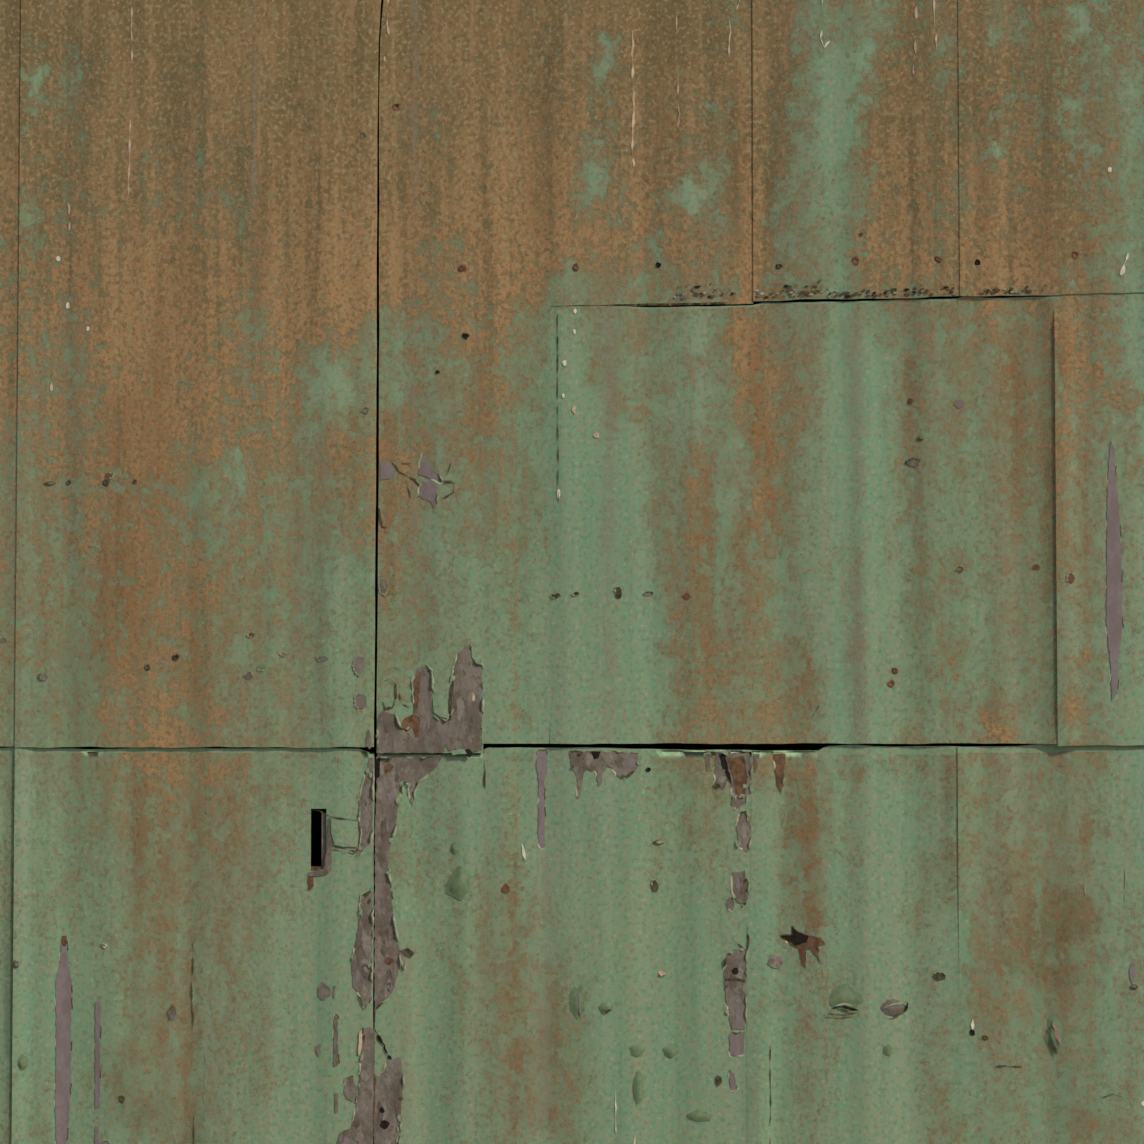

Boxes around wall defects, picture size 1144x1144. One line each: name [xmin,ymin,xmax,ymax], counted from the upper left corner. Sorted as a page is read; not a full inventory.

corrosion [829,0,1144,818]
corrosion [0,0,830,1144]
peeling [1105,441,1125,700]
peeling [534,748,548,850]
peeling [568,749,641,799]
peeling [54,936,74,1144]
peeling [93,1001,102,1108]
peeling [316,1013,341,1066]
peeling [335,643,484,1144]
peeling [716,948,748,1093]
peeling [725,870,750,913]
peeling [767,927,825,969]